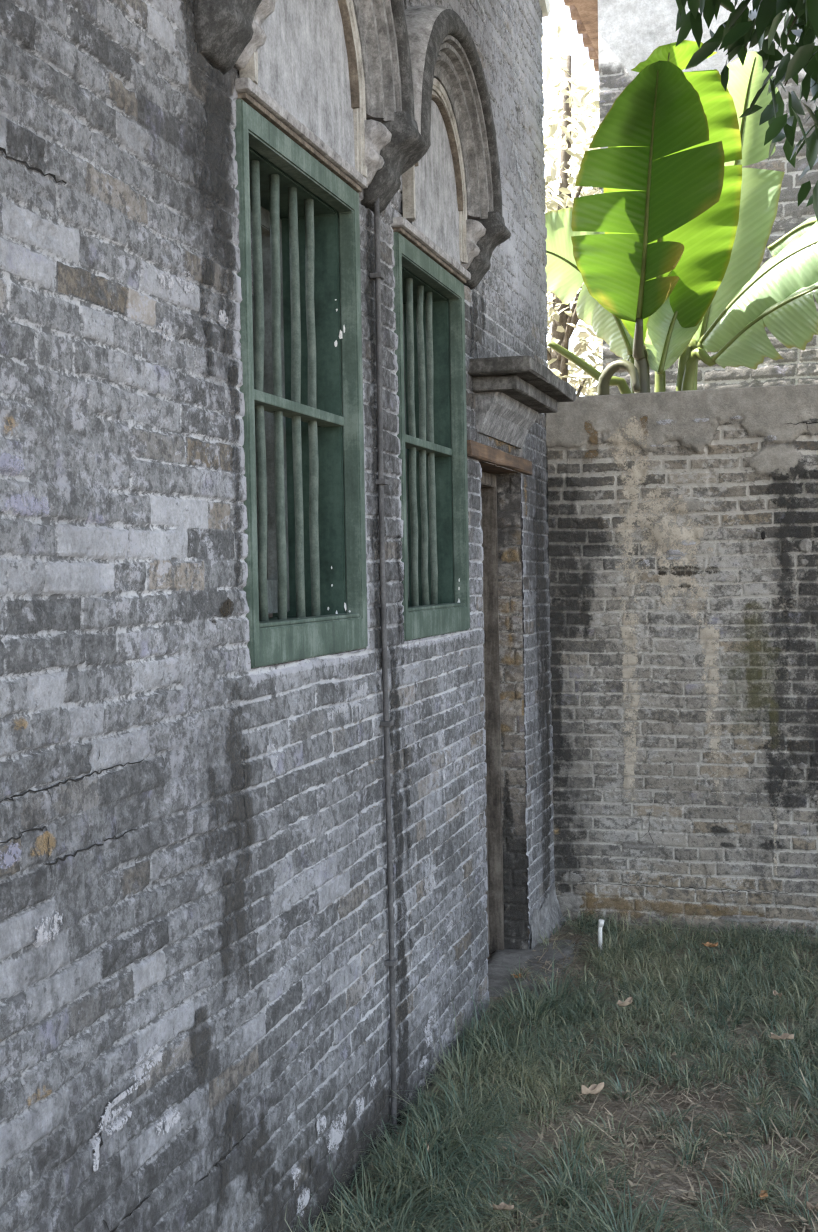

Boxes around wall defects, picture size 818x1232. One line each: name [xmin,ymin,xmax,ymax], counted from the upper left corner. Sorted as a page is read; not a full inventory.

crack [0,136,67,185]
leakage [181,0,276,599]
crack [0,751,144,878]
leakage [200,684,255,997]
leakage [218,0,533,1232]
leakage [533,416,724,898]
leakage [711,825,735,847]
leakage [755,459,818,875]
leakage [189,1006,213,1106]